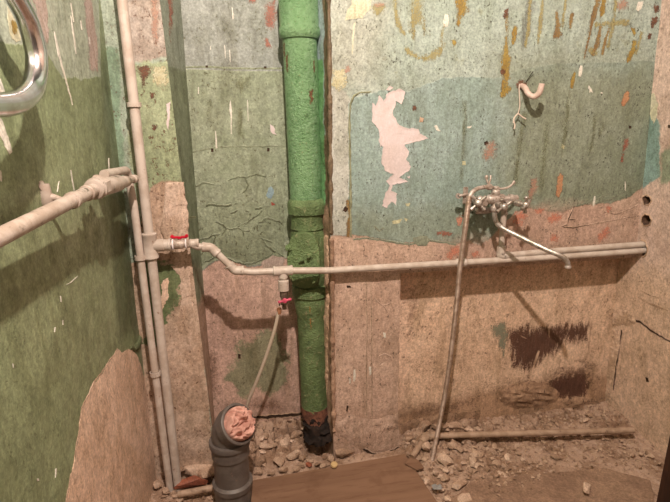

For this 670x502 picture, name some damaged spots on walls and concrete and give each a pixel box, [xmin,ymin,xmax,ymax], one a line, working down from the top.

peeling [372,86,427,208]
crack [195,173,266,205]
peeling [353,225,456,246]
peeling [161,278,169,310]
peeling [171,263,197,345]
peeling [65,336,157,502]
damp [508,322,590,382]
spalling [499,381,600,409]
damp [541,361,591,398]
crack [613,319,670,391]